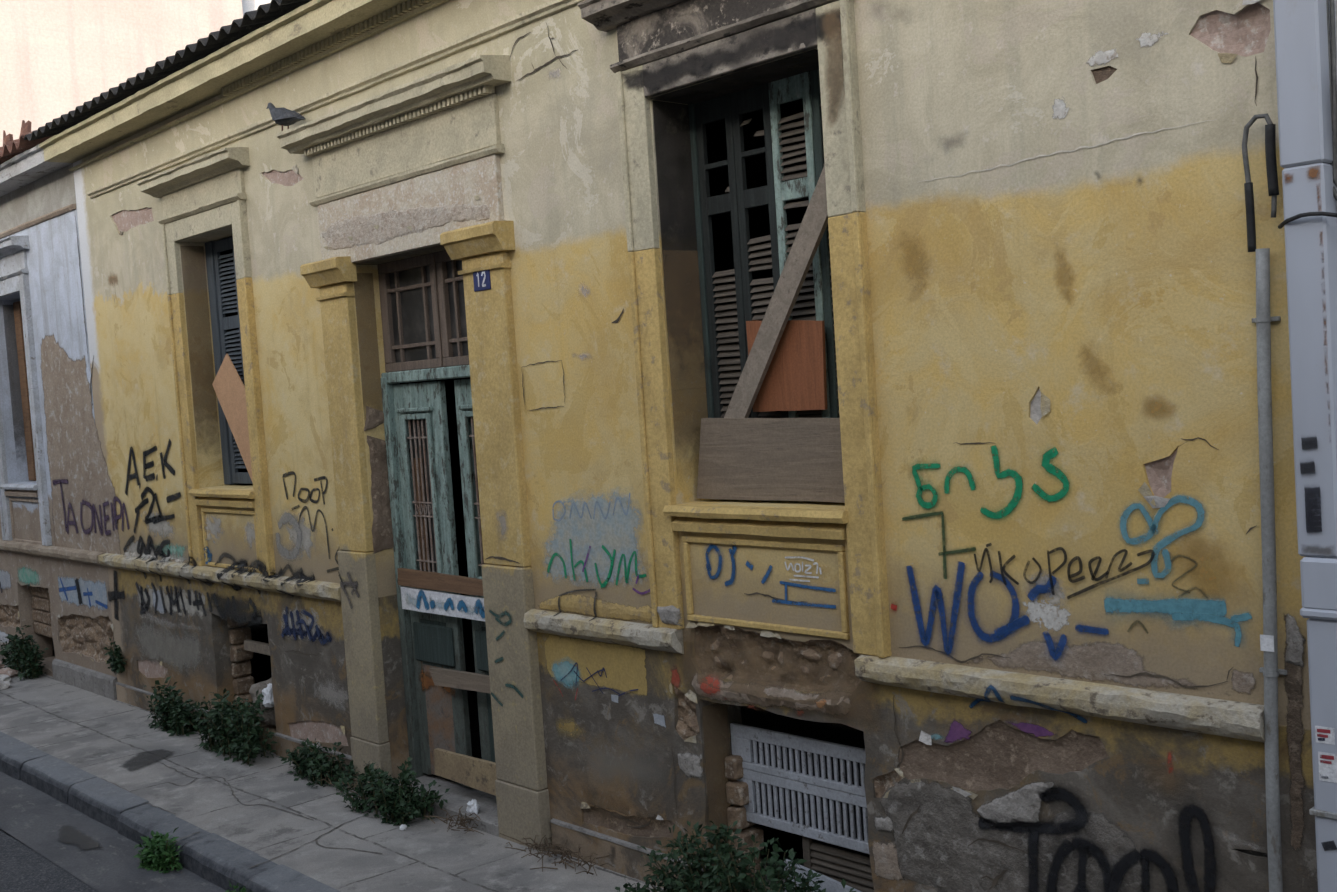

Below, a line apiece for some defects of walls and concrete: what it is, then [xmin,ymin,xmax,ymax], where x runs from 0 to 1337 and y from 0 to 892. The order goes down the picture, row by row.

spalling [1190,0,1271,64]
peeling [1086,48,1118,84]
spalling [111,207,154,235]
spalling [1030,388,1050,424]
peeling [41,334,121,555]
spalling [1138,448,1178,508]
spalling [57,614,114,663]
spalling [657,605,860,681]
spalling [874,720,1108,823]
flaking render [872,816,903,881]